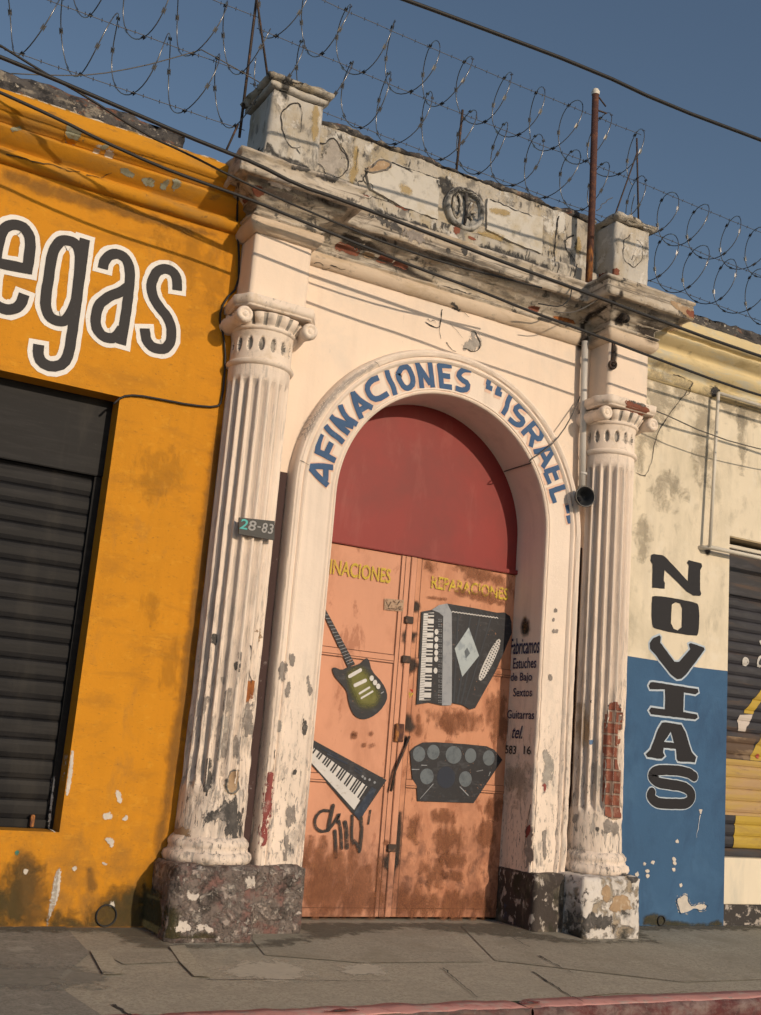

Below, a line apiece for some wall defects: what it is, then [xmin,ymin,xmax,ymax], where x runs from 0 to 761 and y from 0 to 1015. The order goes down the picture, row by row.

peeling [278,653,295,697]
peeling [48,751,74,832]
peeling [47,866,77,926]
leakage [0,862,213,939]
peeling [202,677,275,848]
peeling [283,804,296,861]
corrosion [302,835,386,920]
corrosion [397,808,495,921]
corrosion [474,799,504,848]
peeling [563,885,632,933]
flaking render [589,702,623,837]
peeling [676,883,709,915]